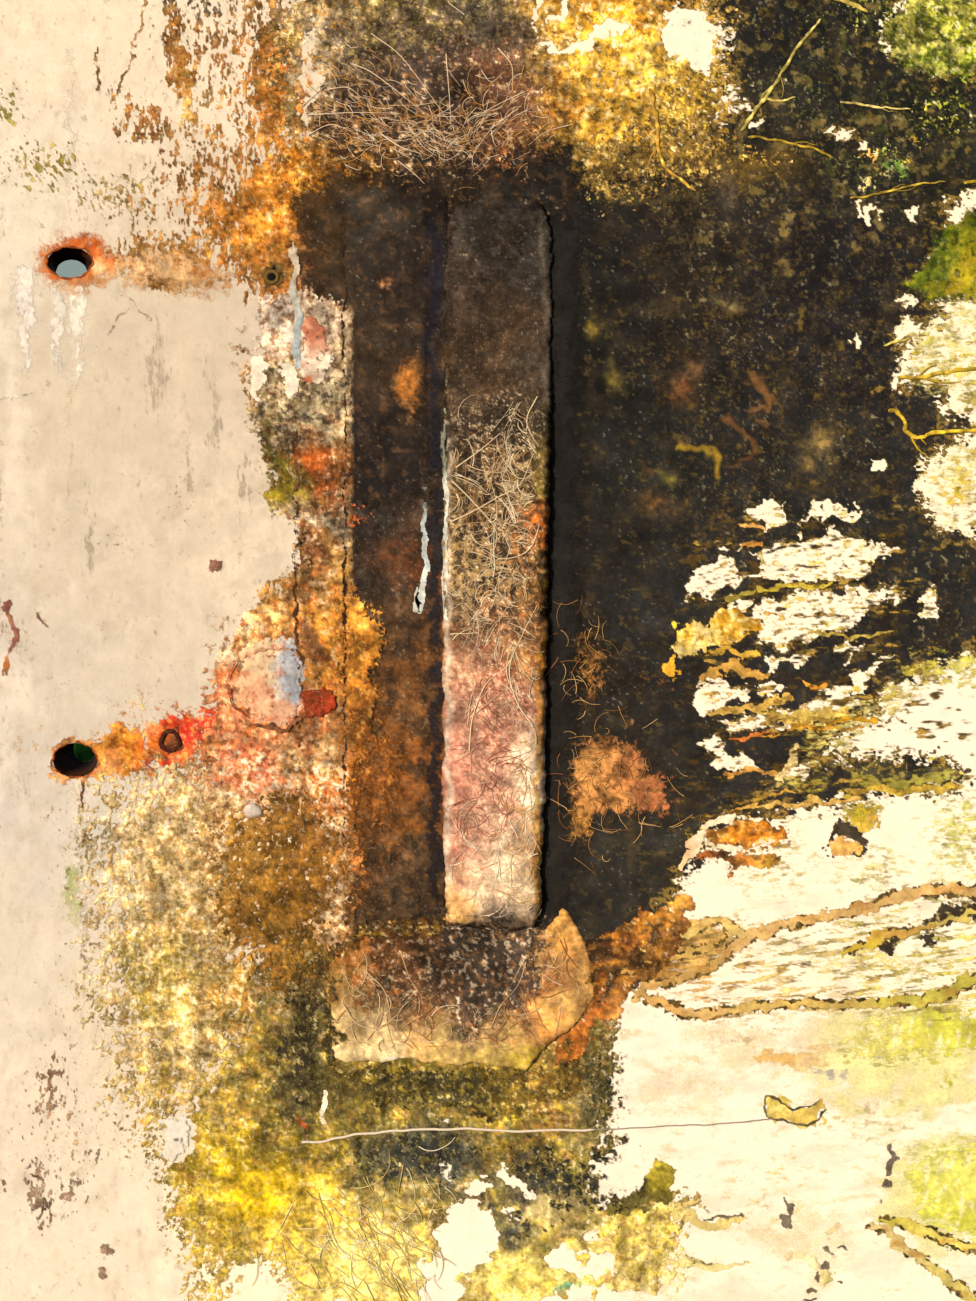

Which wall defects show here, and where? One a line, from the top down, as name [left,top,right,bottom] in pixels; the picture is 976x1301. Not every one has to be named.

leakage [10,265,88,402]
peeling [250,242,334,401]
corrosion [17,0,405,958]
leakage [289,0,976,1033]
corrosion [1,600,19,676]
peeling [662,654,682,681]
peeling [19,1045,102,1235]
leakage [275,982,328,1124]
leakage [342,1055,629,1250]
corrosion [556,894,695,1066]
spalling [763,1095,827,1129]
peeling [880,1144,899,1203]